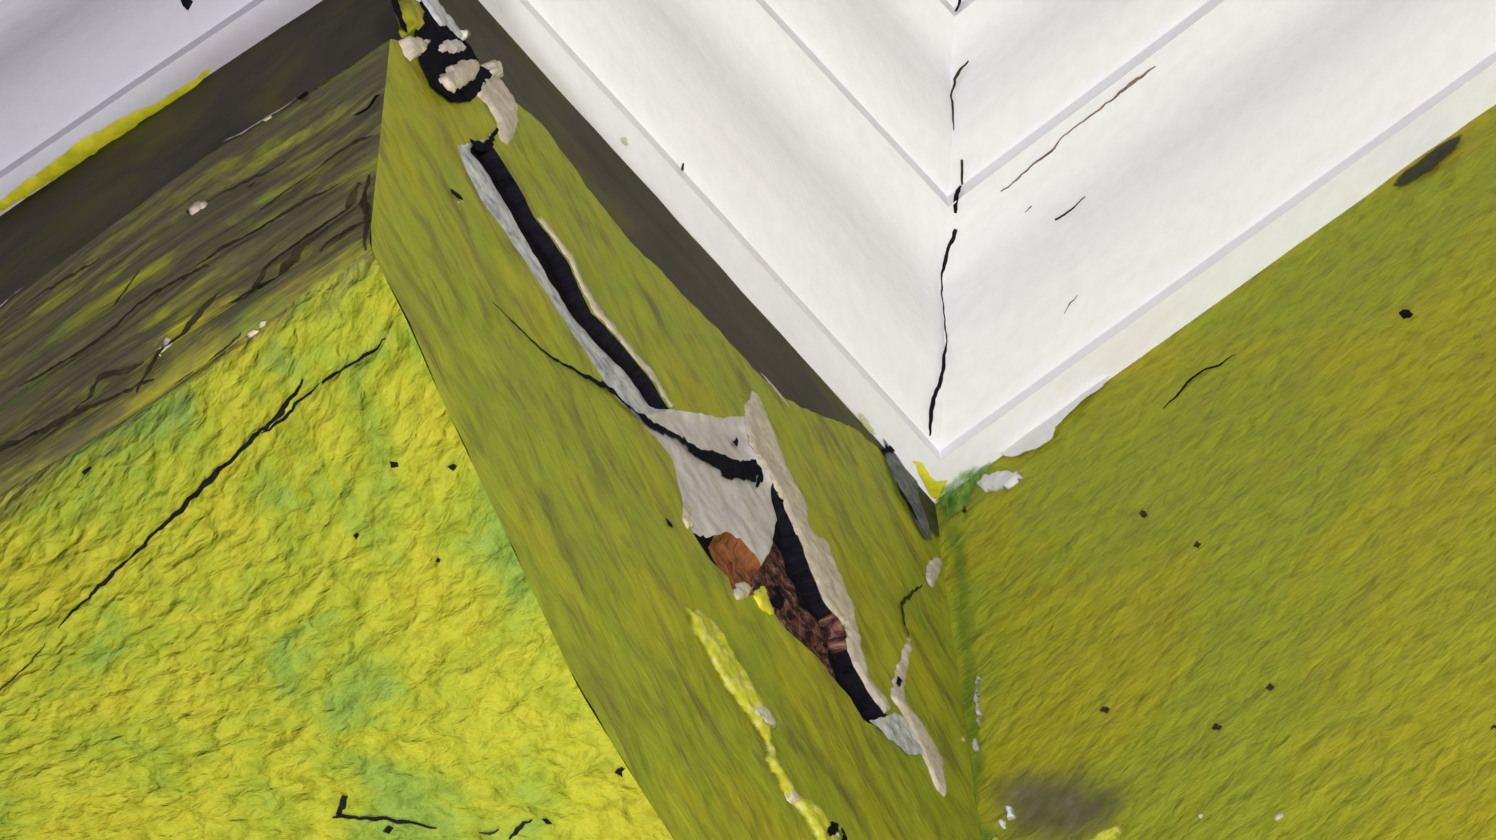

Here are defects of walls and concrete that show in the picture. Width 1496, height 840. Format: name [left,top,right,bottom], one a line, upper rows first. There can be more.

spalling [391,0,519,145]
crack [1001,66,1156,192]
leakage [1394,135,1461,186]
crack [929,61,969,436]
crack [1163,354,1236,409]
crack [0,338,386,690]
flaking render [638,373,923,755]
flaking render [926,557,943,588]
peeling [686,607,847,840]
crack [332,795,437,834]
crack [479,819,552,840]
leakage [998,784,1107,829]